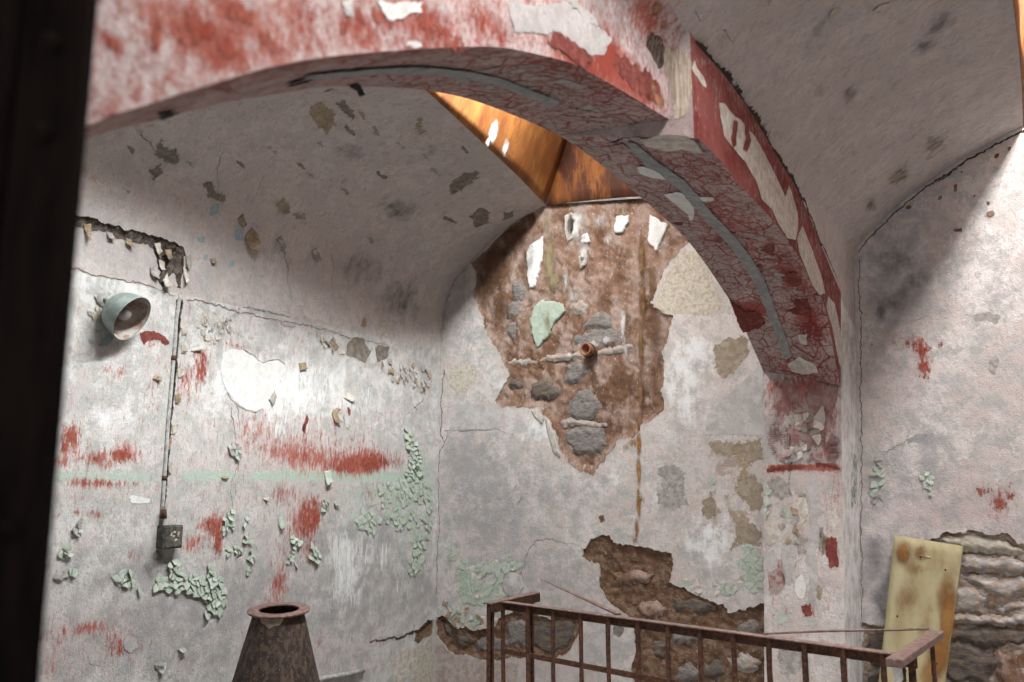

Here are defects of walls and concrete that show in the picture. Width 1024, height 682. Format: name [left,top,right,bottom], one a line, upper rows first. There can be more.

peeling [378,0,423,21]
peeling [508,0,612,56]
peeling [79,216,233,520]
crack [75,250,381,344]
spalling [471,192,735,476]
crack [695,10,1024,619]
peeling [111,558,228,620]
crack [403,370,506,594]
spalling [414,546,579,682]
rust [630,434,642,538]
spalling [582,438,806,682]
spalling [930,530,1024,682]